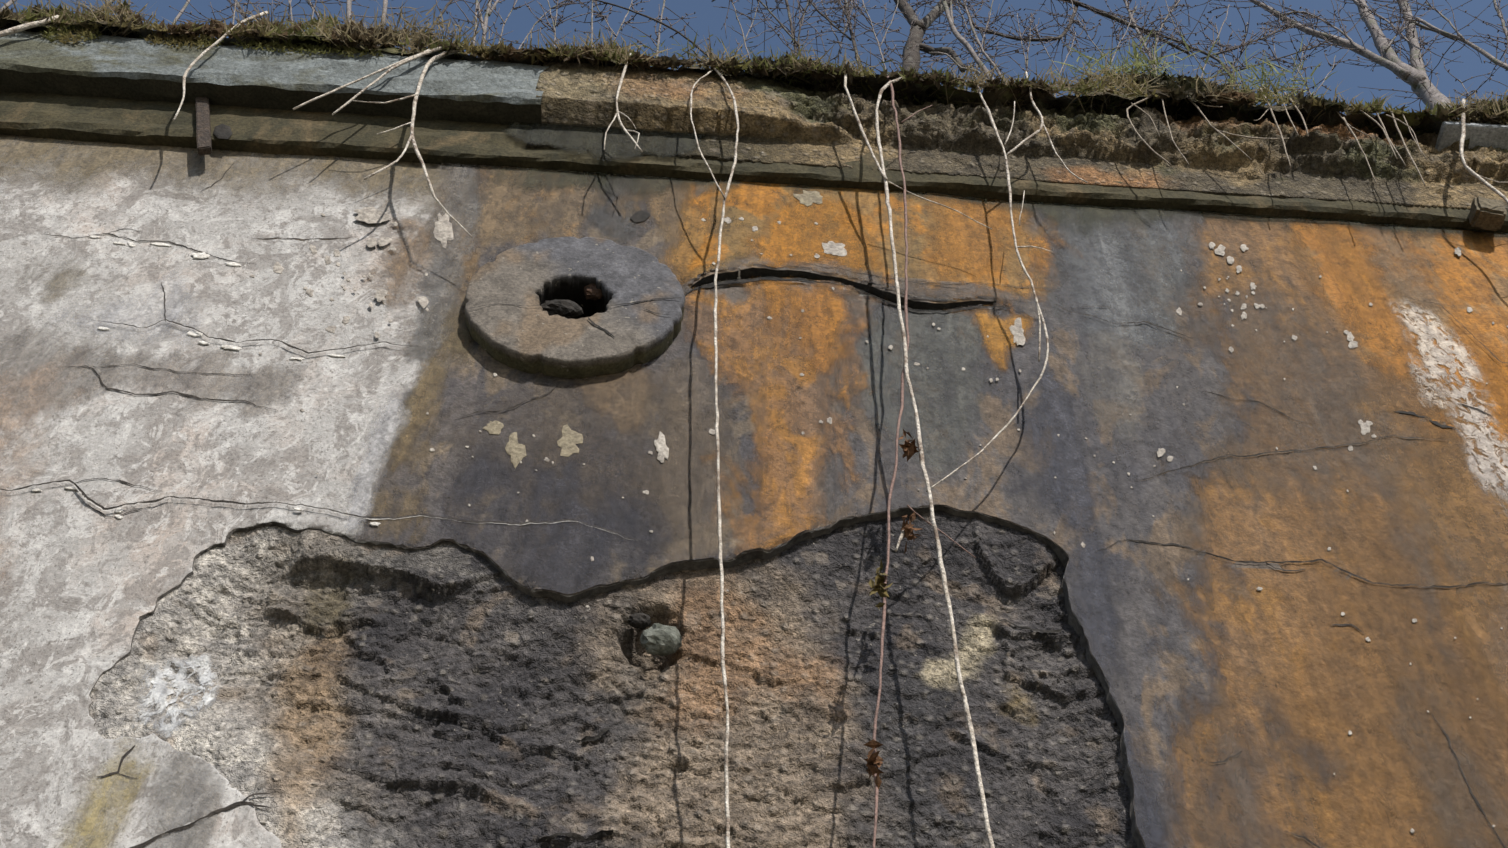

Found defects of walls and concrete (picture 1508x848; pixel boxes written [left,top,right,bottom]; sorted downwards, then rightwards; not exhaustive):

crack [40,229,409,410]
crack [1,478,648,542]
spalling [89,510,1138,848]
leakage [0,134,1387,848]
corrosion [668,181,1049,554]
crack [588,262,1199,341]
crack [1095,539,1508,588]
corrosion [1161,212,1508,848]
leakage [1362,223,1508,500]
crack [130,791,276,848]